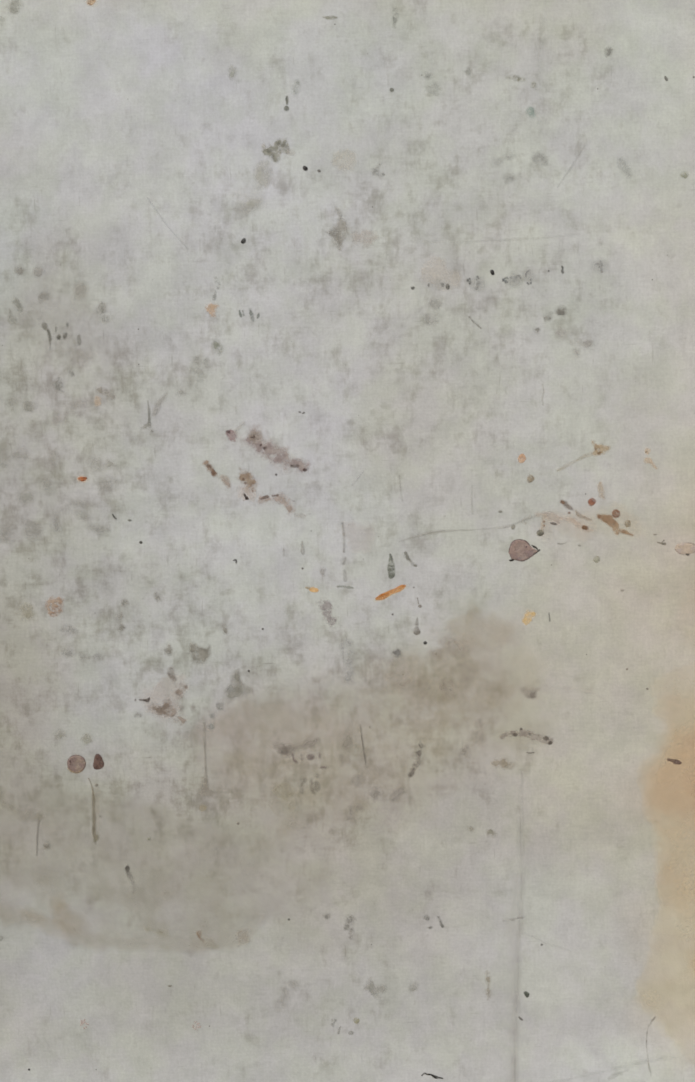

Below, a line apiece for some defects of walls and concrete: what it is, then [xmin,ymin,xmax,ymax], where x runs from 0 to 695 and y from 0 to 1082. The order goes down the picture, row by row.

leakage [320,601,336,625]
leakage [190,645,209,661]
leakage [142,674,187,723]
leakage [209,674,249,729]
leakage [274,739,325,768]
leakage [500,728,552,753]